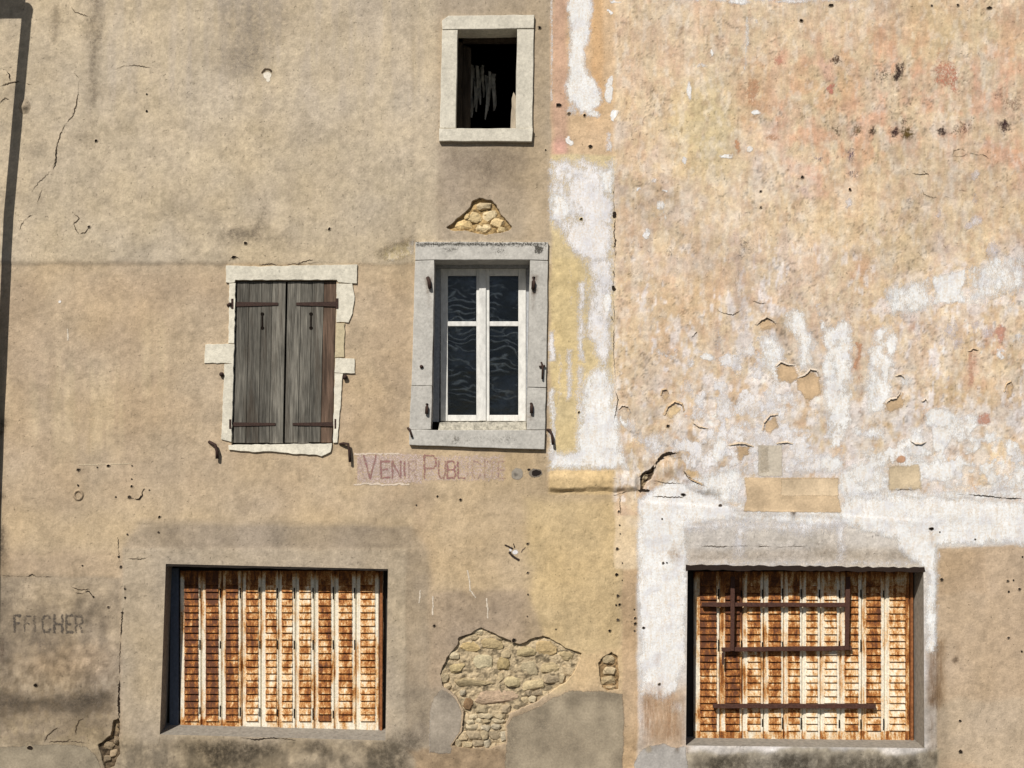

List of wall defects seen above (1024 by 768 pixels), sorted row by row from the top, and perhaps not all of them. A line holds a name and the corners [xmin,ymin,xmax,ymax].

crack [20,72,79,228]
flaking render [448,199,511,235]
crack [619,452,704,514]
peeling [545,134,1024,719]
flaking render [99,719,120,768]
flaking render [440,628,581,748]